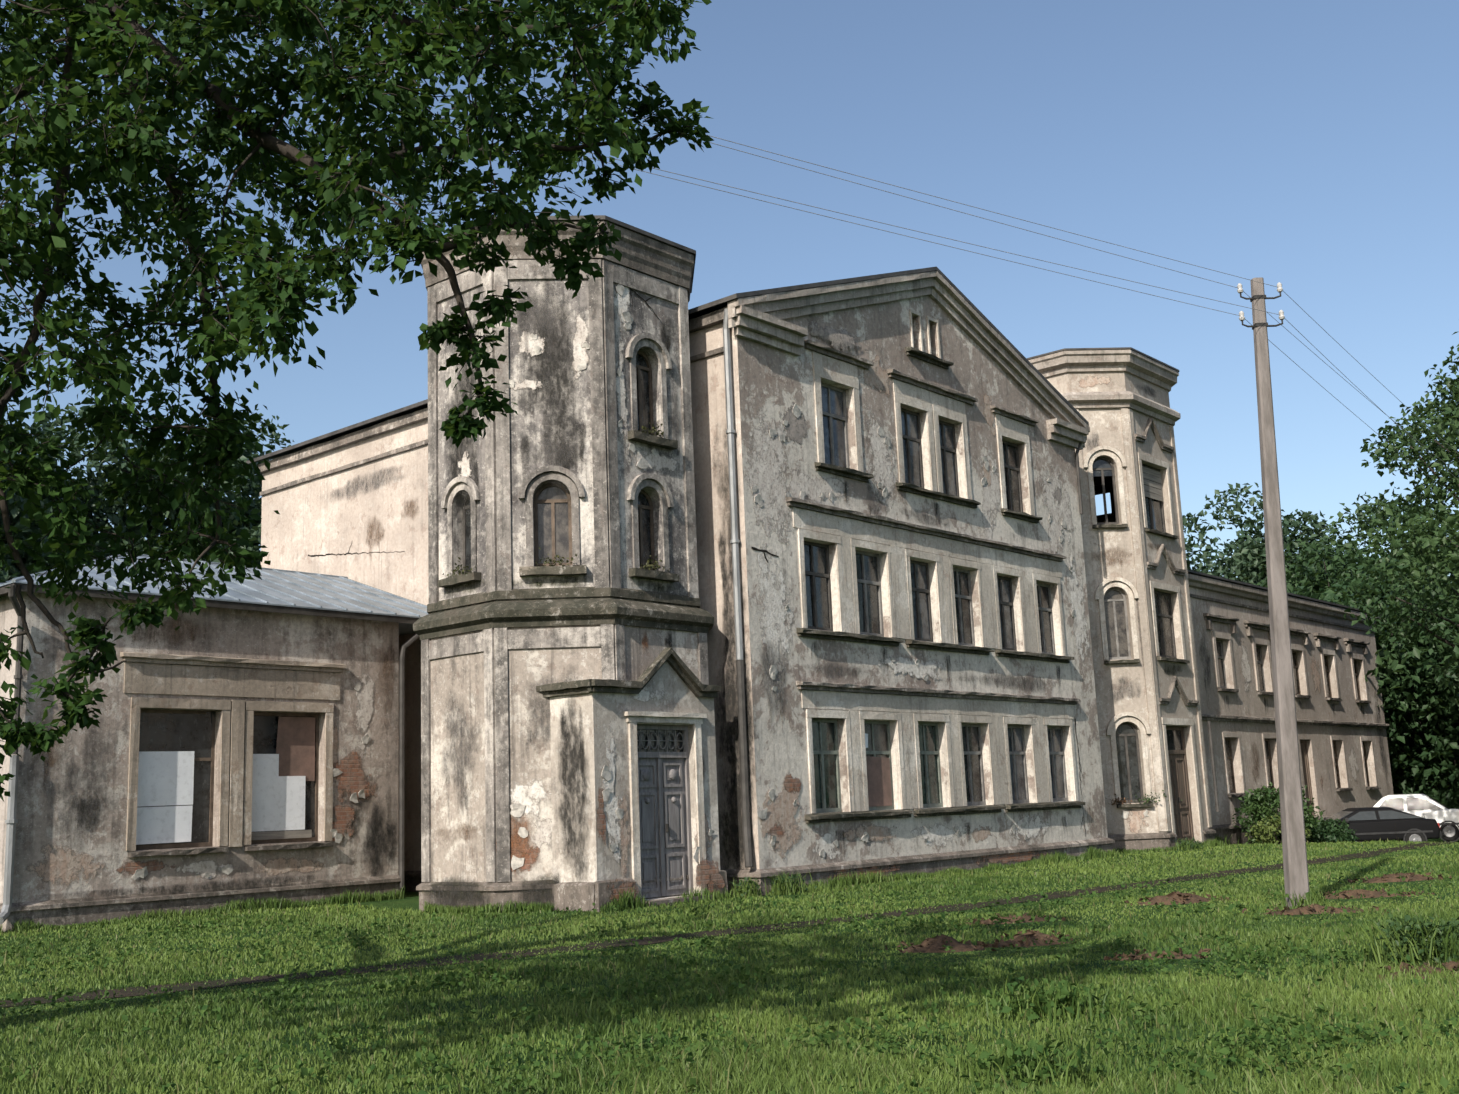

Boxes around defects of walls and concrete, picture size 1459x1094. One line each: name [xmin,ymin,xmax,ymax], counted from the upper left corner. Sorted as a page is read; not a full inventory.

flaking render [518,331,545,357]
leakage [521,293,585,485]
leakage [713,435,785,868]
peeling [350,789,365,803]
leakage [347,788,395,877]
leakage [445,701,473,798]
flaking render [509,778,552,870]
leakage [530,682,587,875]
flaking render [757,786,840,859]
flaking render [911,815,1050,847]
leakage [520,878,559,908]